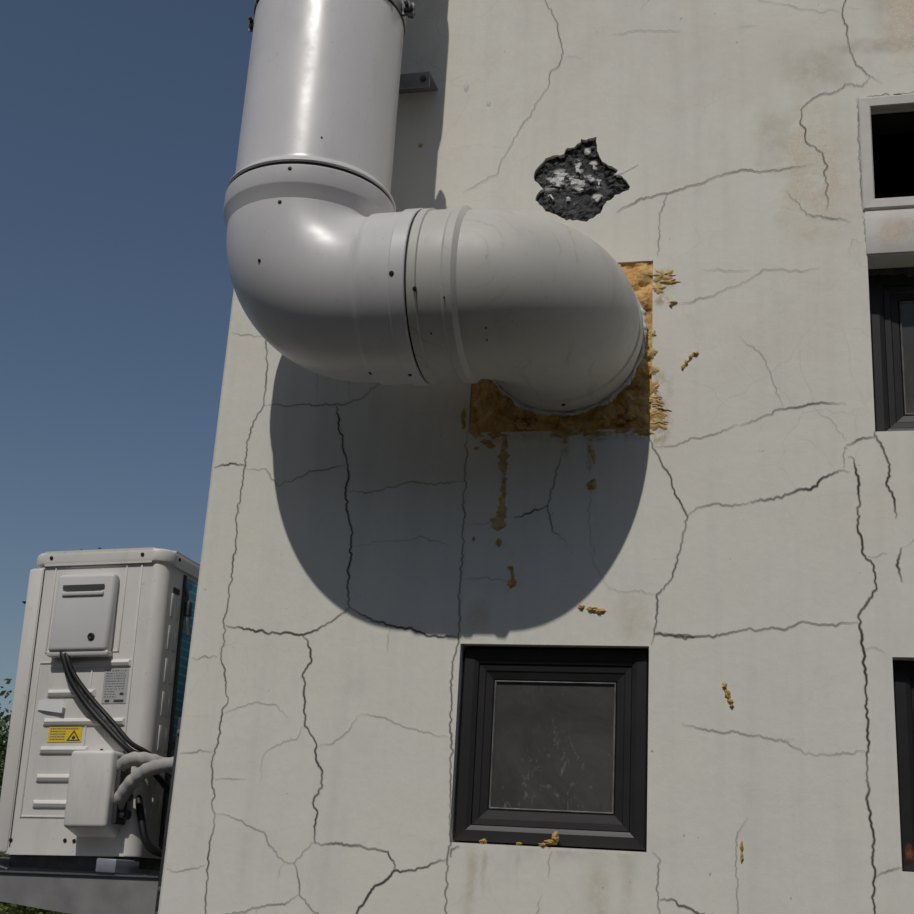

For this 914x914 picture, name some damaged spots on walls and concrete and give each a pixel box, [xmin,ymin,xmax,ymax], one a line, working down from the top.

spalling [535,140,629,222]
crack [800,90,838,176]
crack [204,341,468,914]
crack [652,436,901,914]